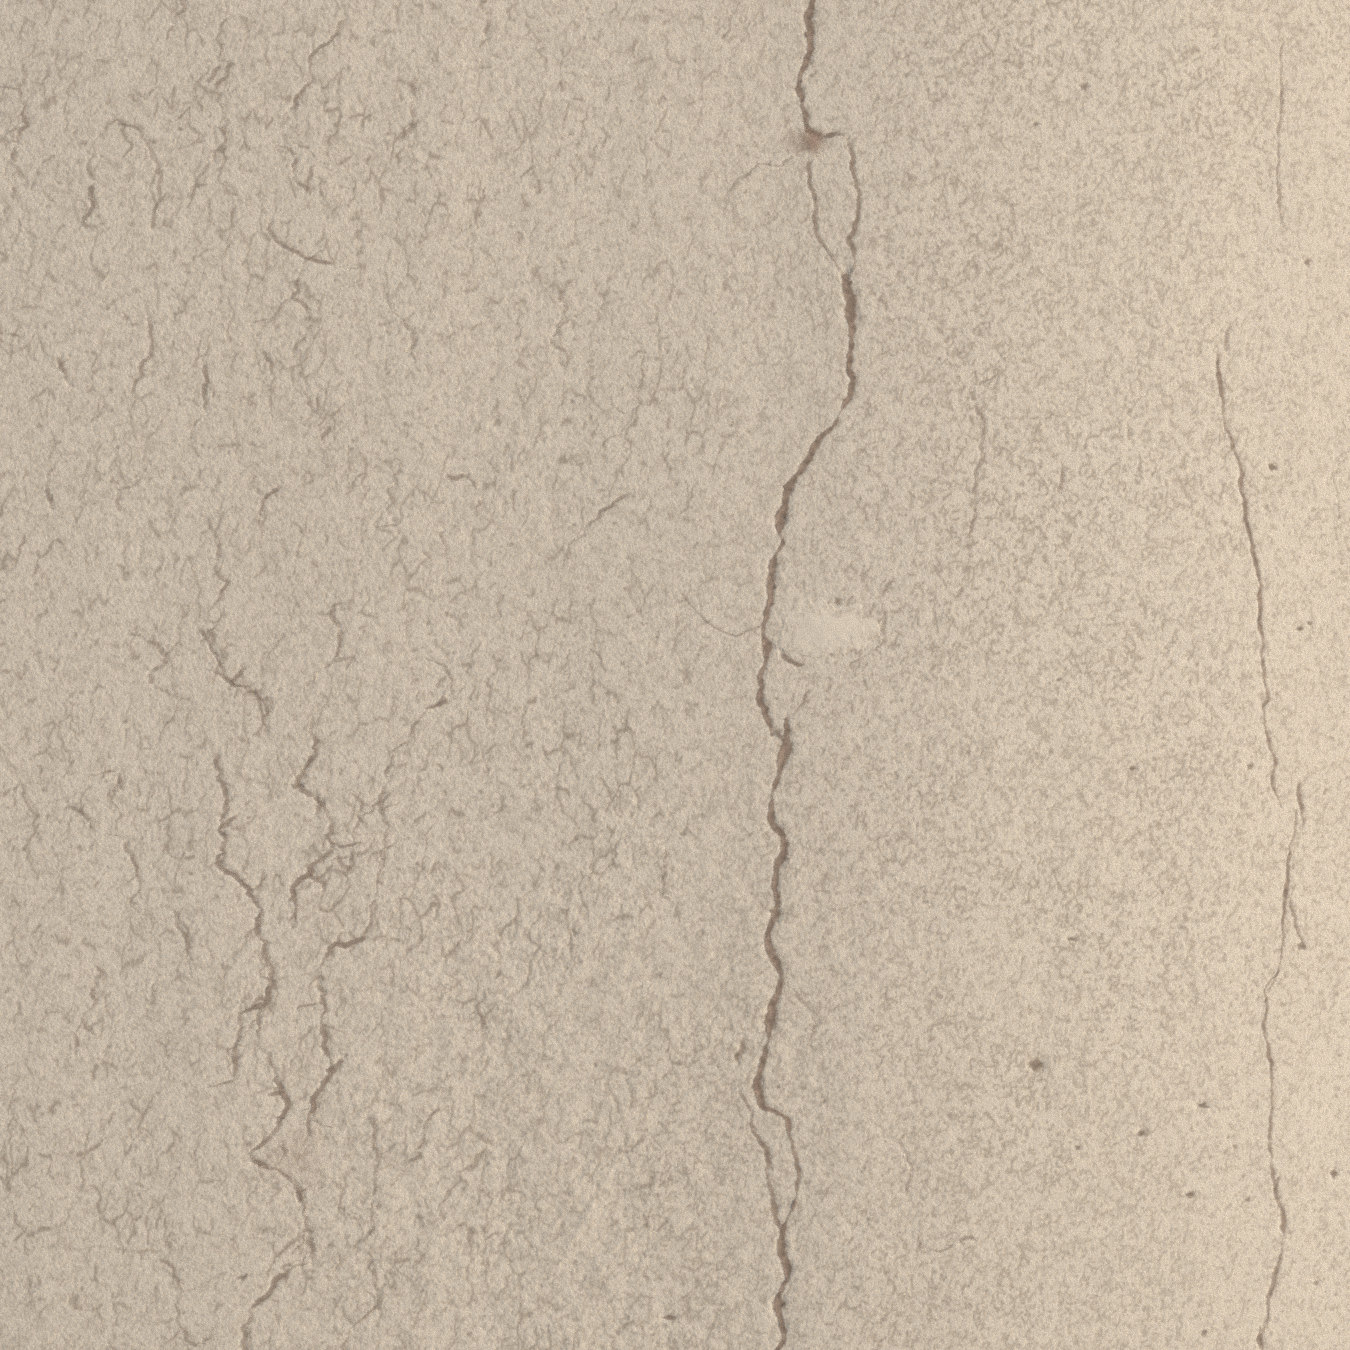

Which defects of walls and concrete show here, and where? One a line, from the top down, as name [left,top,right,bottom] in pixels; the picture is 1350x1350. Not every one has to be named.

crack [1216,357,1224,401]
crack [1229,435,1263,637]
crack [224,674,269,730]
crack [735,0,861,1350]
crack [1263,671,1304,811]
crack [215,739,334,1025]
crack [326,931,367,958]
crack [1282,851,1299,931]
crack [252,998,343,1307]
crack [1262,1010,1275,1178]
crack [1267,1266,1279,1299]
crack [1280,1209,1288,1231]